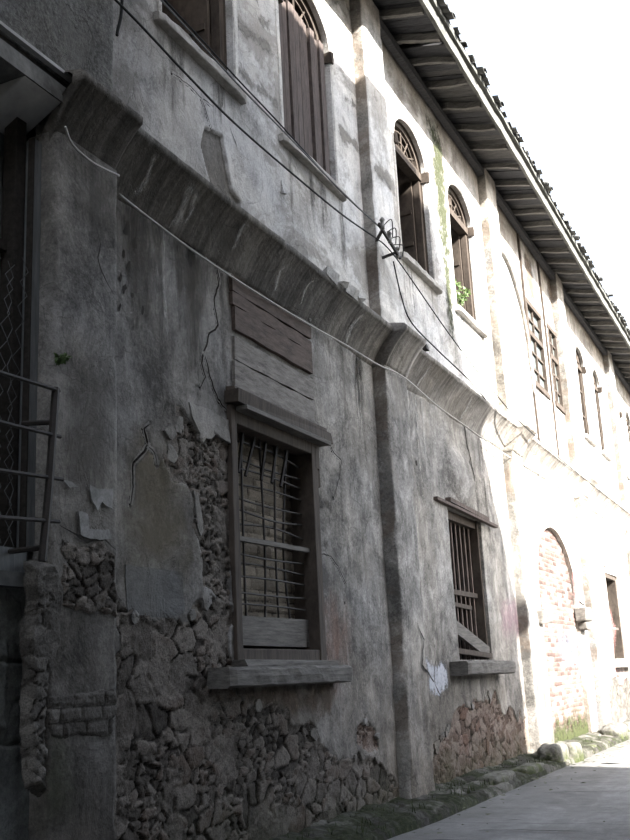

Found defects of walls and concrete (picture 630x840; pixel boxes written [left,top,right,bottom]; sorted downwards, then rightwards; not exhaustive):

crack [199,257,227,411]
crack [129,421,159,506]
flaking render [114,402,399,840]
flaking render [432,690,527,784]
flaking render [609,676,630,722]